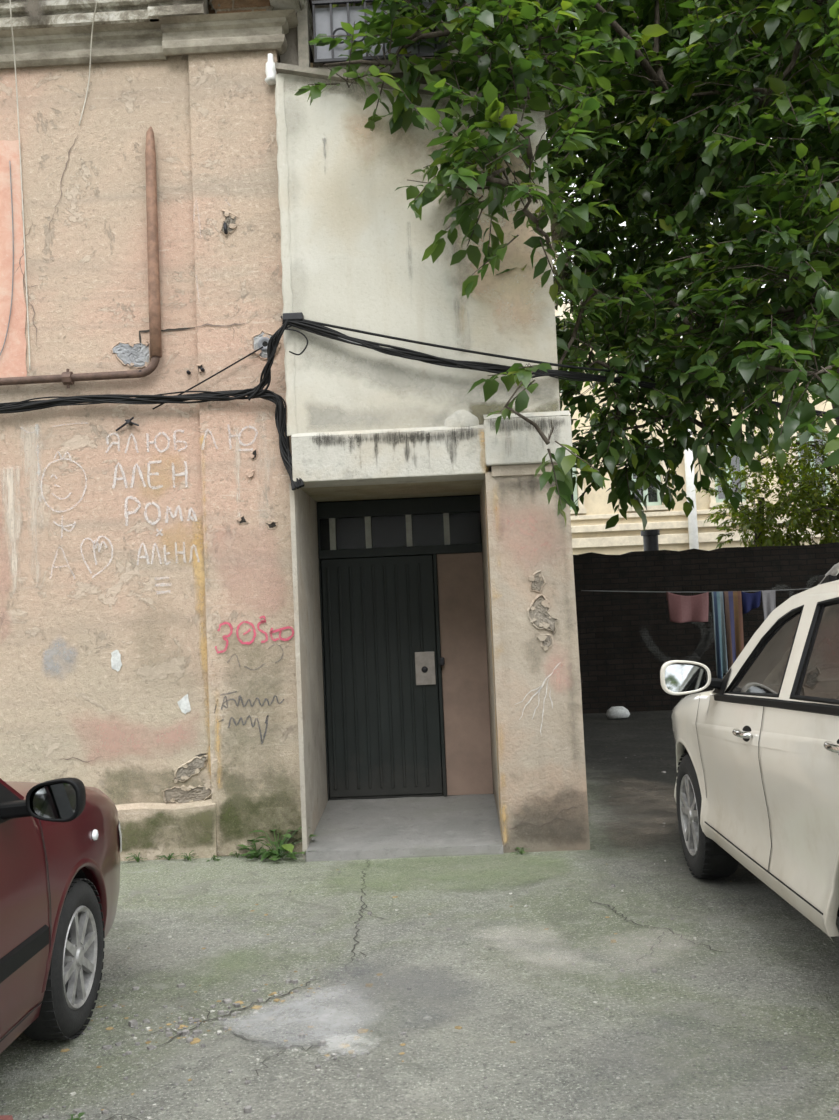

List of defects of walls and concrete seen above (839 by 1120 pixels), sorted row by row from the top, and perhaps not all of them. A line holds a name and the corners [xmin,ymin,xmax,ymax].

damp [309,408,474,460]
spalling [526,570,560,653]
flaking render [162,755,212,804]